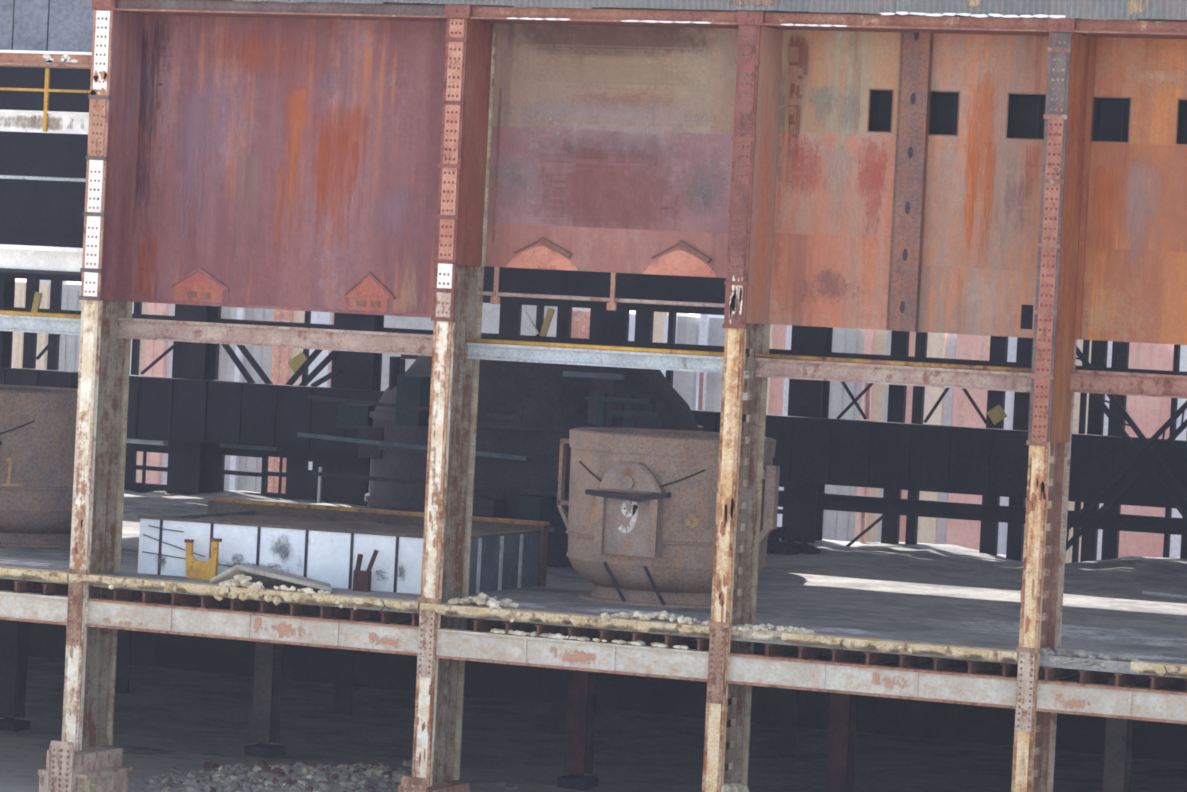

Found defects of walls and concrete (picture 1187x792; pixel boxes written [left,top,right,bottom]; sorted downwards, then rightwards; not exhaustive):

rust [787,37,808,147]